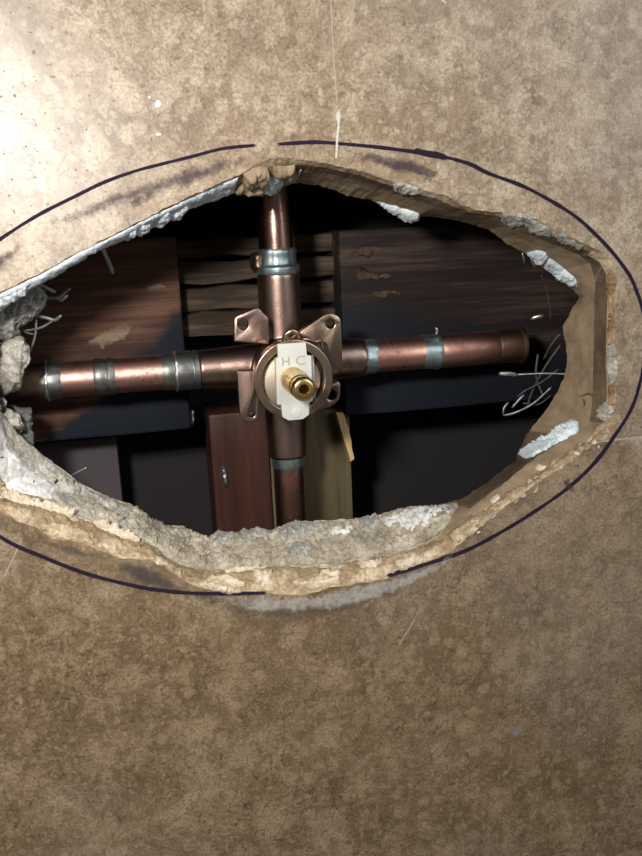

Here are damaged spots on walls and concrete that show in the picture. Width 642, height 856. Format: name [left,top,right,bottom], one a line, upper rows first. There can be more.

peeling [393,183,420,196]
peeling [376,201,420,224]
spalling [0,165,302,312]
spalling [501,213,586,250]
peeling [527,250,577,287]
spalling [0,272,618,595]